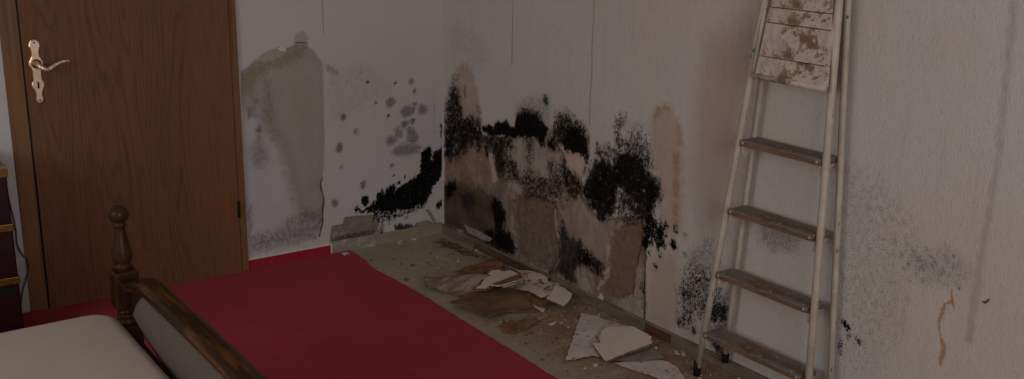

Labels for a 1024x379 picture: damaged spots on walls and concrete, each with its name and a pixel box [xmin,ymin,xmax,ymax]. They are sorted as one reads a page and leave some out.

water stain [354,76,729,335]
peeling [444,135,649,320]
rust [938,289,954,366]